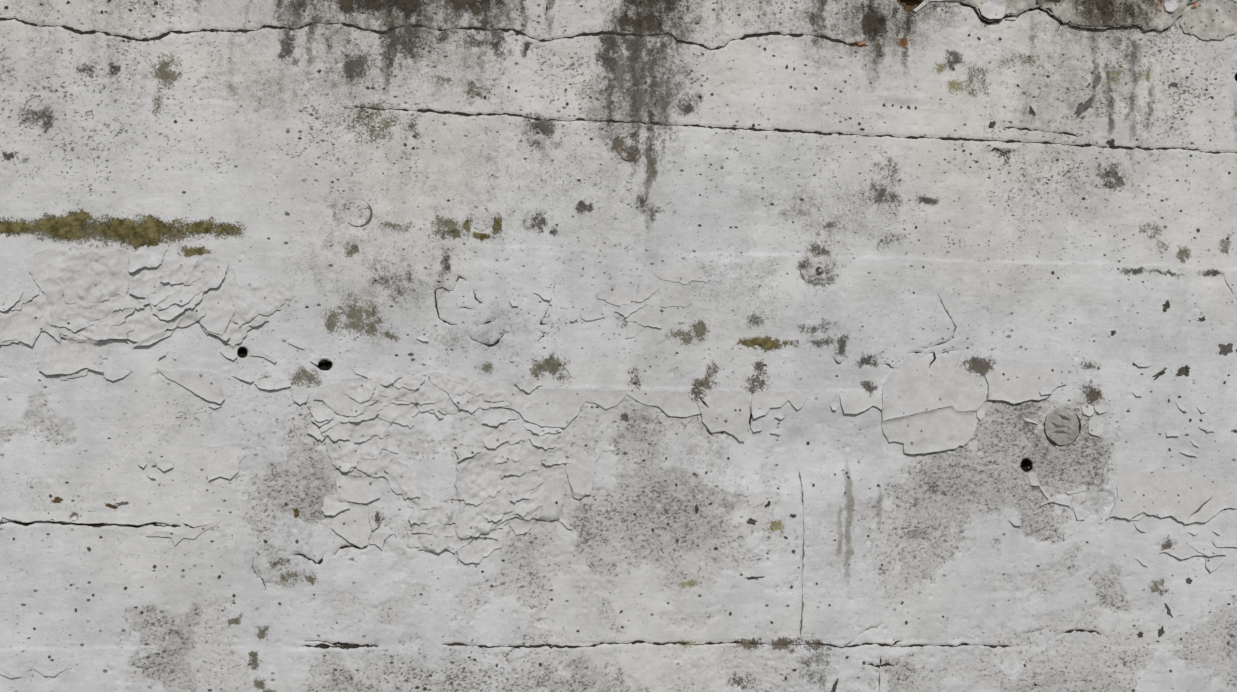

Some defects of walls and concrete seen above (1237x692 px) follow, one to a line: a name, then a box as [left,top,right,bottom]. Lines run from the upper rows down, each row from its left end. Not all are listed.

leakage [277,0,530,82]
crack [0,4,858,50]
leakage [852,0,945,60]
crack [961,4,1172,31]
leakage [594,0,701,182]
crack [344,106,1237,160]
leakage [575,200,593,213]
peeling [0,229,811,564]
peeling [830,352,1069,454]
peeling [1133,361,1190,380]
peeling [1106,468,1237,572]
crack [443,469,1102,691]